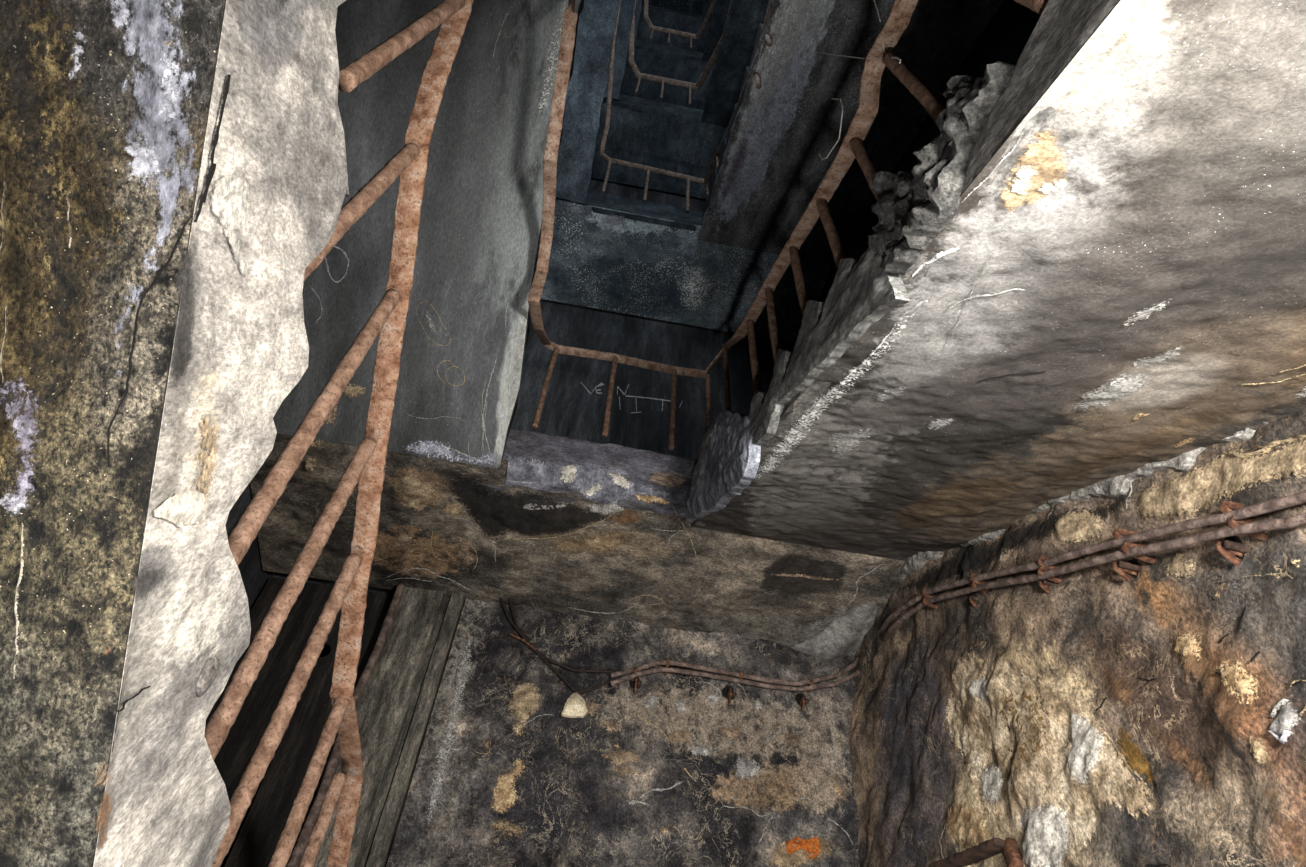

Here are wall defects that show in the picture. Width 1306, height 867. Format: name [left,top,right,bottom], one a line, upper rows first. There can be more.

water stain [111,0,199,348]
spalling [1000,129,1084,212]
water stain [0,0,125,679]
crack [107,74,231,467]
water stain [172,249,197,383]
spalling [685,61,1015,523]
water stain [129,564,164,598]
rust [195,414,220,501]
spalling [394,474,624,570]
flaking render [636,494,670,505]